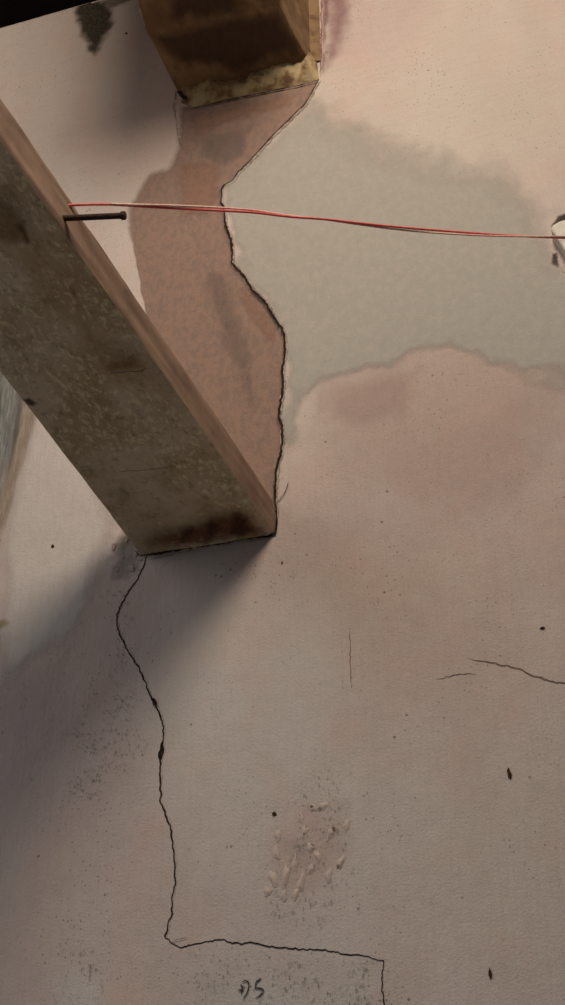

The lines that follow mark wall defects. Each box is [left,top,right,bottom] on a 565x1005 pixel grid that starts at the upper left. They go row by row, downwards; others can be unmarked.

flaking render [130,81,317,502]
crack [116,556,385,1005]
crack [438,659,565,684]